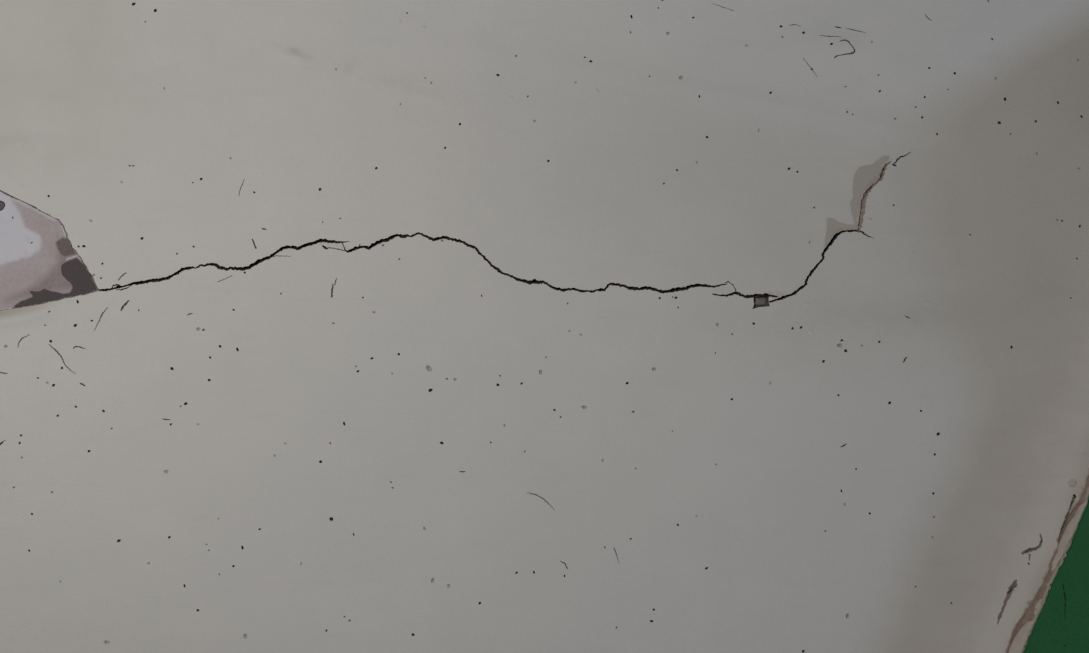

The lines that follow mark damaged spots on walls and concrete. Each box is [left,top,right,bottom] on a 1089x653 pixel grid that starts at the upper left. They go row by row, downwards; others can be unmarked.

flaking render [0,190,103,326]
crack [99,152,911,303]